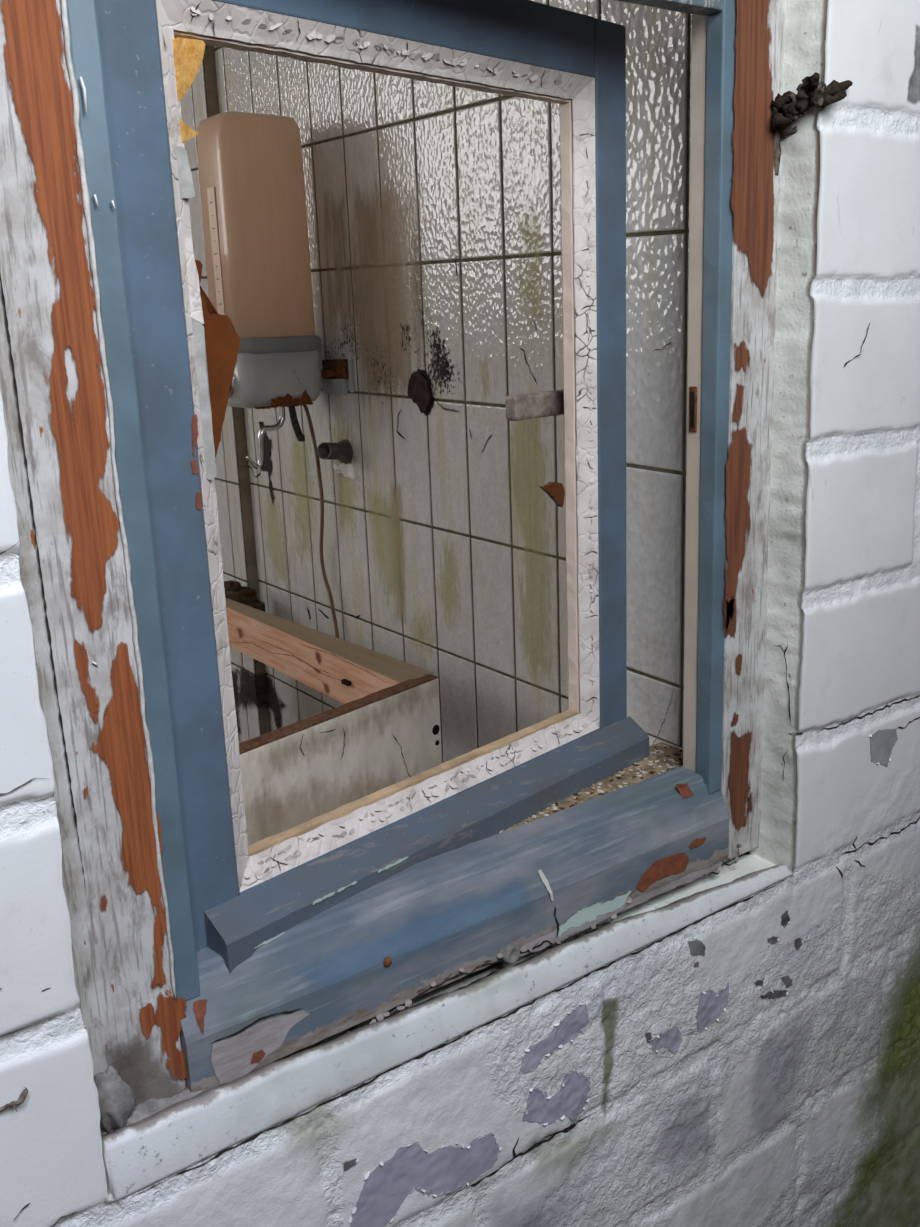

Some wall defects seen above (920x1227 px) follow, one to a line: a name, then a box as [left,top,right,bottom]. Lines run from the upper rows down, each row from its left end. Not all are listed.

peeling [908,26,920,103]
peeling [731,0,774,297]
peeling [723,341,752,638]
peeling [0,0,207,1081]
leakage [393,488,402,617]
peeling [519,712,753,957]
crack [836,817,920,877]
peeling [211,1010,310,1085]
peeling [519,1002,589,1074]
peeling [645,983,731,1054]
peeling [523,1070,592,1125]
peeling [344,1133,502,1227]